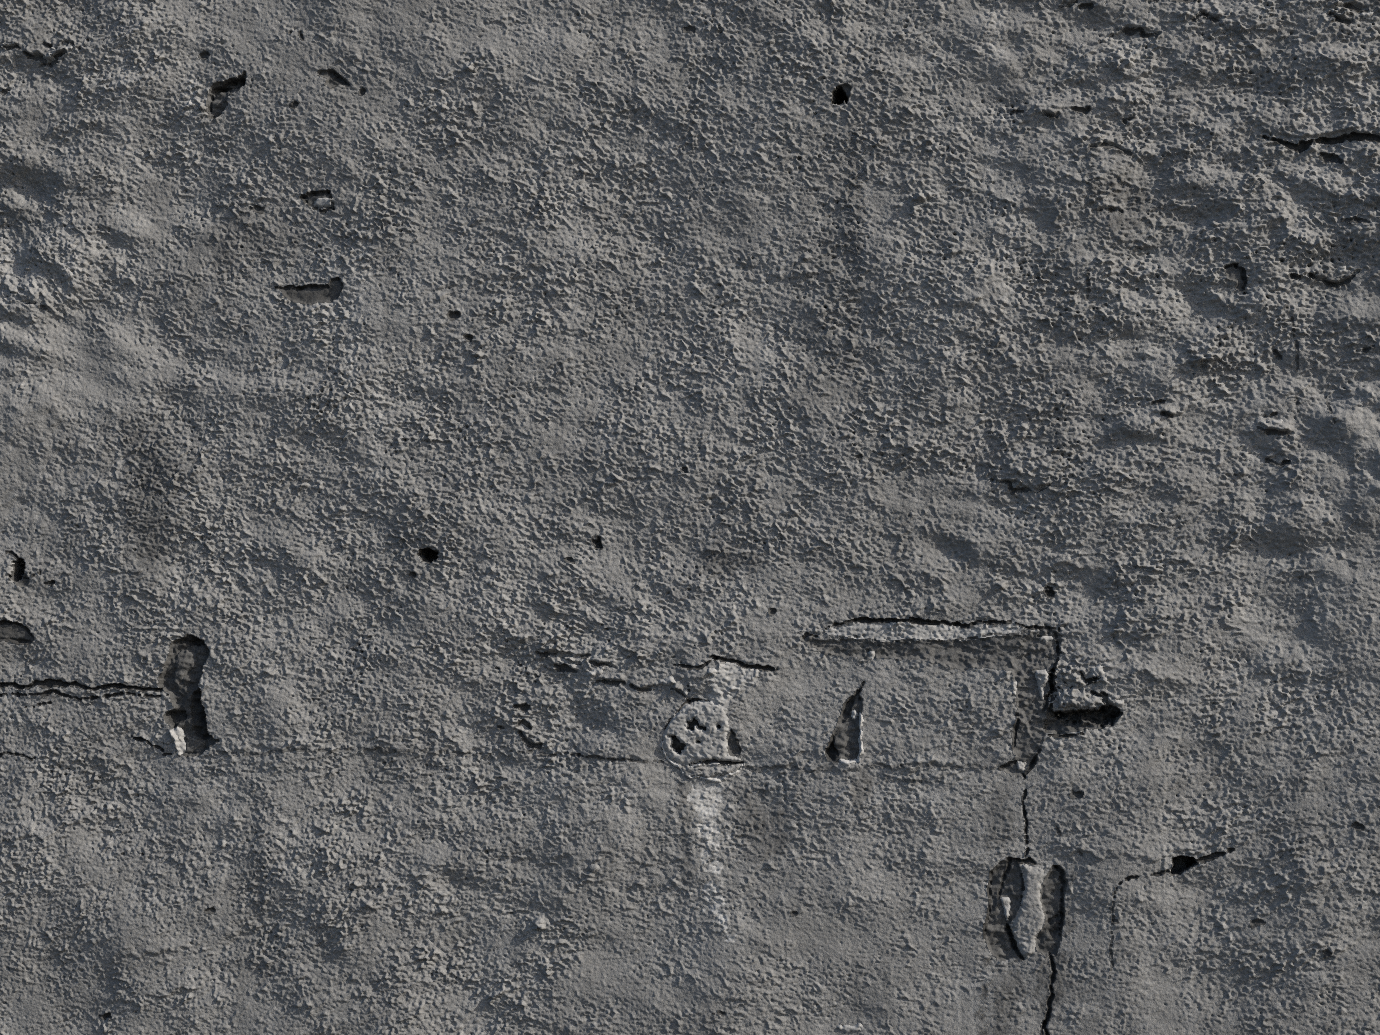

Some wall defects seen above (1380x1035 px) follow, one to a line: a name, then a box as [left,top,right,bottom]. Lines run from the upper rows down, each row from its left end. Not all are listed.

spalling [206,71,246,119]
crack [1263,131,1380,153]
spalling [275,277,343,305]
crack [0,679,169,708]
spalling [157,634,219,757]
crack [209,655,778,763]
peeling [659,661,760,783]
spalling [800,617,1128,778]
efflorescence [687,778,737,943]
spalling [983,857,1068,962]
crack [1109,848,1235,979]
crack [1041,956,1057,1035]